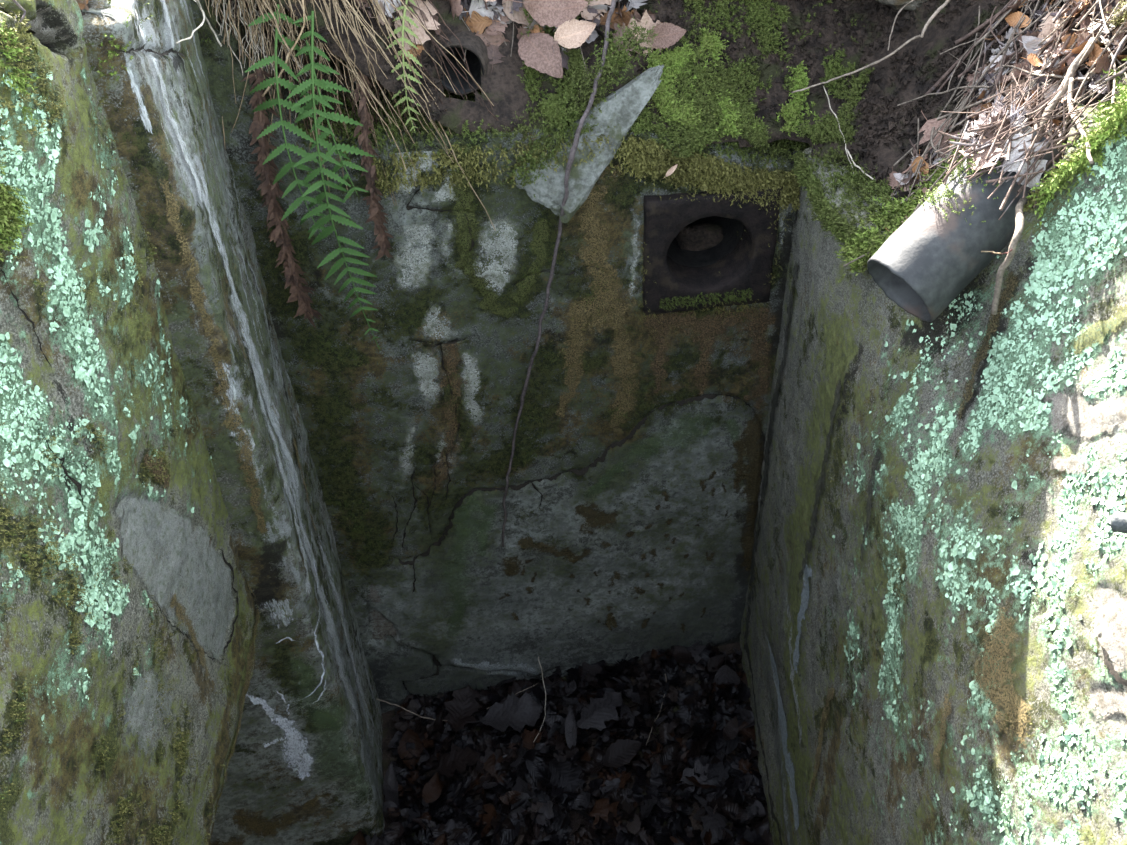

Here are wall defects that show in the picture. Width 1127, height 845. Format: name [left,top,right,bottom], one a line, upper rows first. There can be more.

leakage [160,0,174,49]
leakage [127,63,152,133]
leakage [460,219,552,318]
leakage [152,58,370,725]
crack [368,337,765,593]
crack [403,655,442,690]
leakage [245,691,314,780]